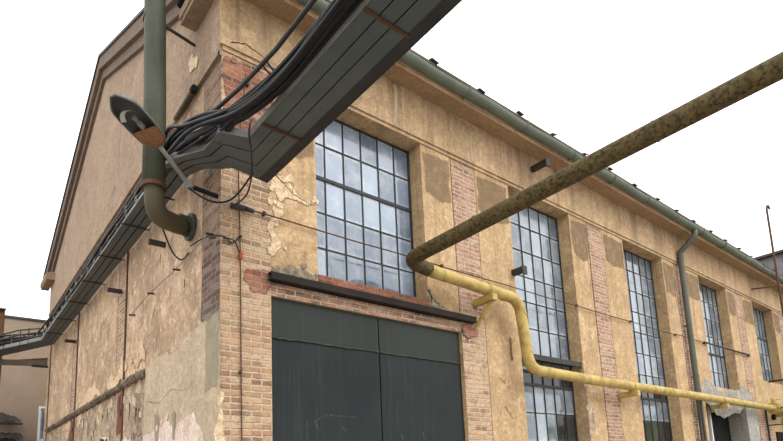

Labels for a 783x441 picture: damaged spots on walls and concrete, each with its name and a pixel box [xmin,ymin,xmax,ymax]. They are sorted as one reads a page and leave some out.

flaking render [243,172,319,294]
spalling [45,343,204,441]
flaking render [214,390,226,441]